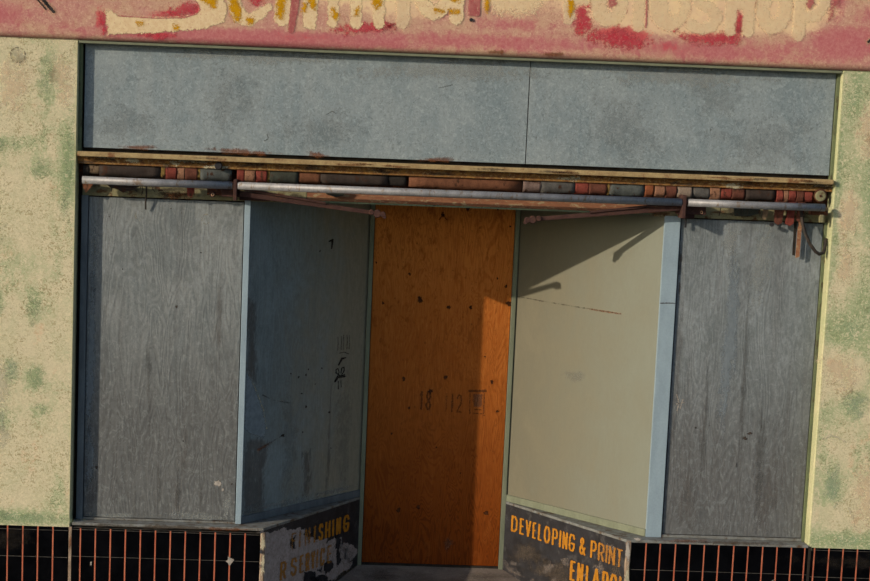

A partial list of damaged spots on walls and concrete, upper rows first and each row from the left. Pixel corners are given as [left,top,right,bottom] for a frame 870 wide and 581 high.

peeling [163,2,195,18]
peeling [330,21,395,36]
peeling [573,3,653,50]
peeling [673,10,743,46]
rust [164,148,264,169]
rust [712,177,768,189]
peeling [260,527,357,581]